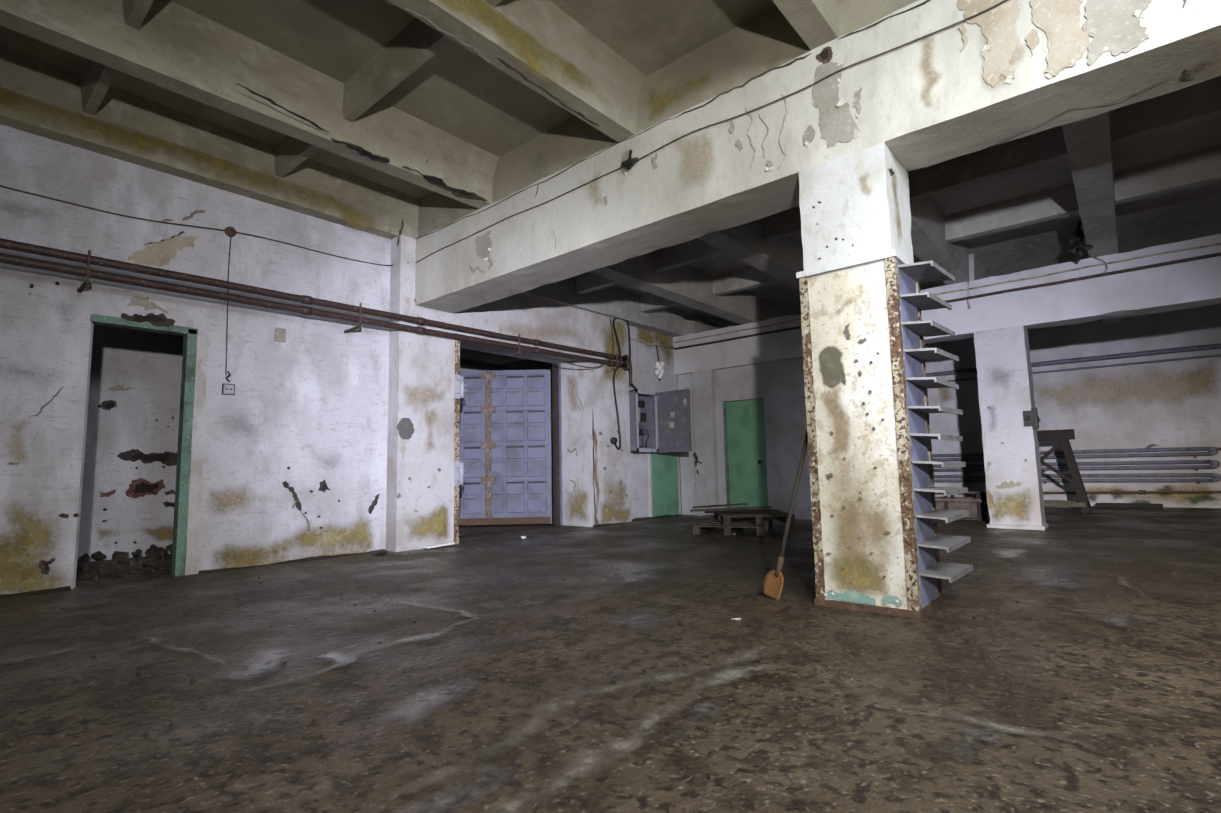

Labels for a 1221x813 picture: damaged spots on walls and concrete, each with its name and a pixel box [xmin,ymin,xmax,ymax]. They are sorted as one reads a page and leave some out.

water stain [444,0,544,73]
peeling [957,0,1152,87]
peeling [803,46,863,148]
peeling [127,231,197,267]
water stain [825,371,847,450]
water stain [0,509,60,593]
flaking render [99,449,177,522]
water stain [221,523,370,568]
water stain [571,494,586,518]
water stain [602,506,629,524]
water stain [835,464,885,591]